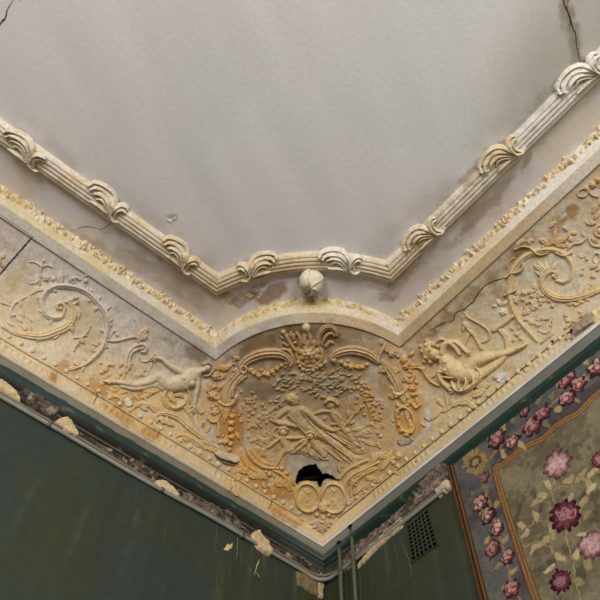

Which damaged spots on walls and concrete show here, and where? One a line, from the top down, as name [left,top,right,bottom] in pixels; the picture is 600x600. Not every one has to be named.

crack [563,0,580,63]
damp [259,284,285,303]
crack [430,278,507,330]
flaking render [19,388,59,417]
flaking render [79,432,158,481]
flaking render [215,450,240,466]
flaking render [285,453,343,487]
flaking render [177,489,250,533]
flaking render [342,463,449,572]